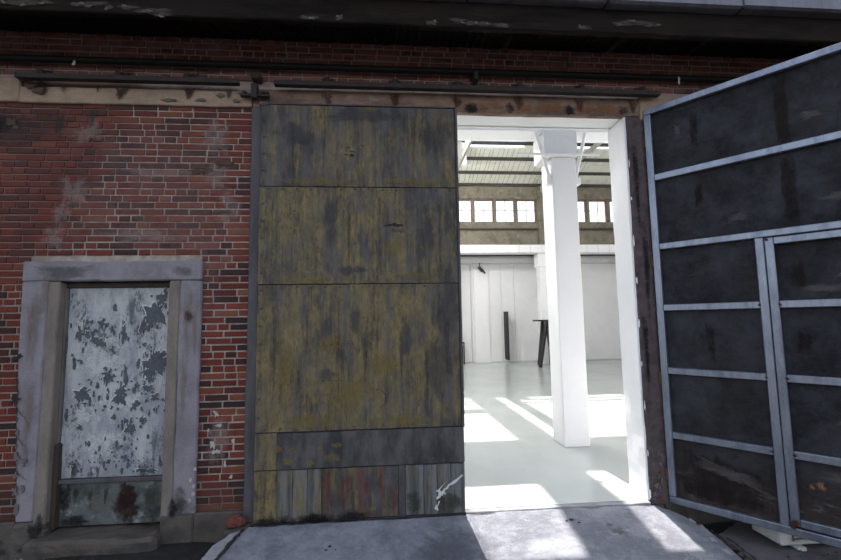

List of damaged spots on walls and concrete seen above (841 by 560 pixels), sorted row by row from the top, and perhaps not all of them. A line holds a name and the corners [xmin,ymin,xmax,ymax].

peeling [64,287,168,476]